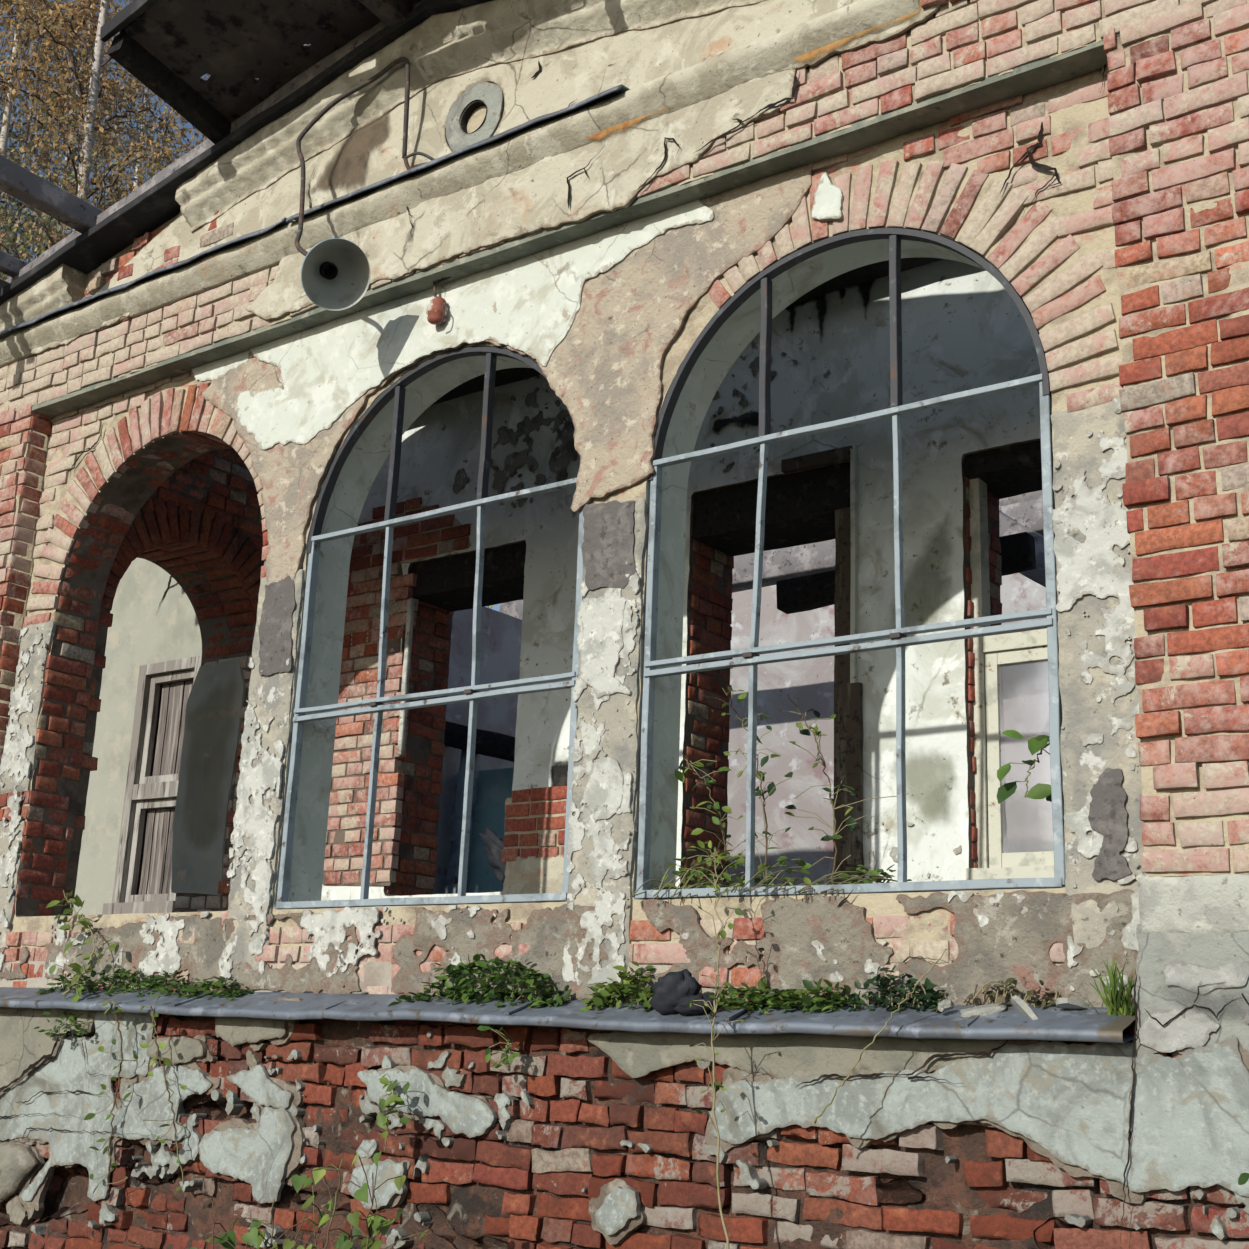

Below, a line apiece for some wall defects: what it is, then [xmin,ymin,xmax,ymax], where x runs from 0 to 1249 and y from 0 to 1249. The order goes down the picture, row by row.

crack [567,144,605,209]
crack [637,66,798,190]
crack [1000,122,1061,217]
peeling [0,627,47,980]
peeling [43,698,402,1001]
flaking render [192,163,1249,1249]
flaking render [0,1007,537,1249]
crack [796,1040,1008,1087]
crack [1120,971,1249,1245]